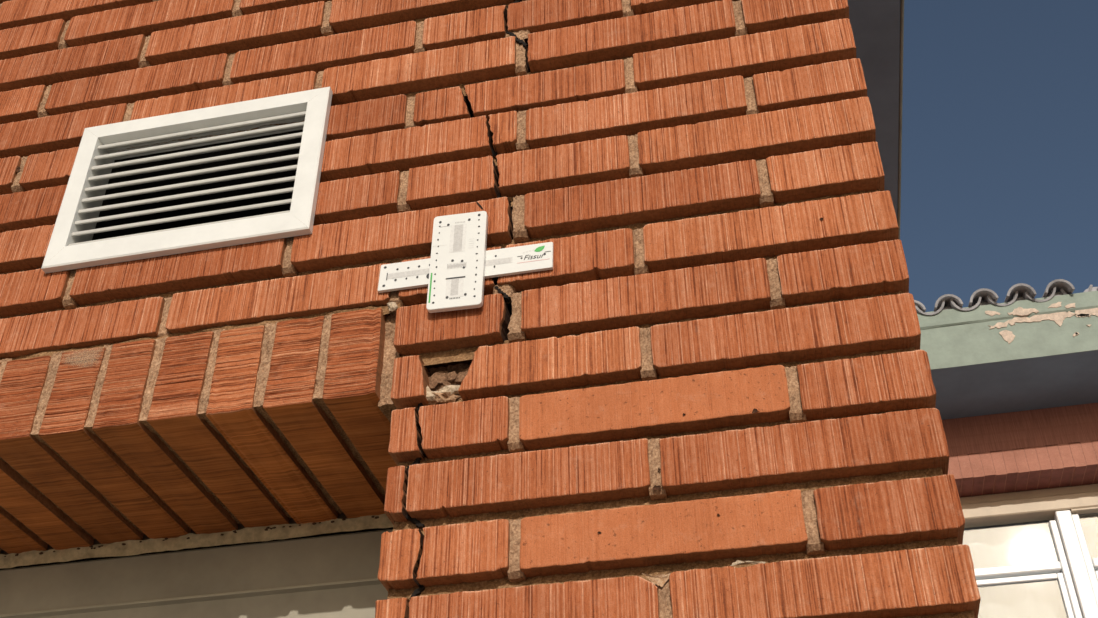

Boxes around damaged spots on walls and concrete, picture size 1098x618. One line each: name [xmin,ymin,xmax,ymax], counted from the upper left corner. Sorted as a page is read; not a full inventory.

crack [504,0,531,72]
crack [462,87,514,249]
crack [492,277,512,341]
peeling [985,302,1098,344]
spalling [426,364,470,405]
crack [402,403,428,608]